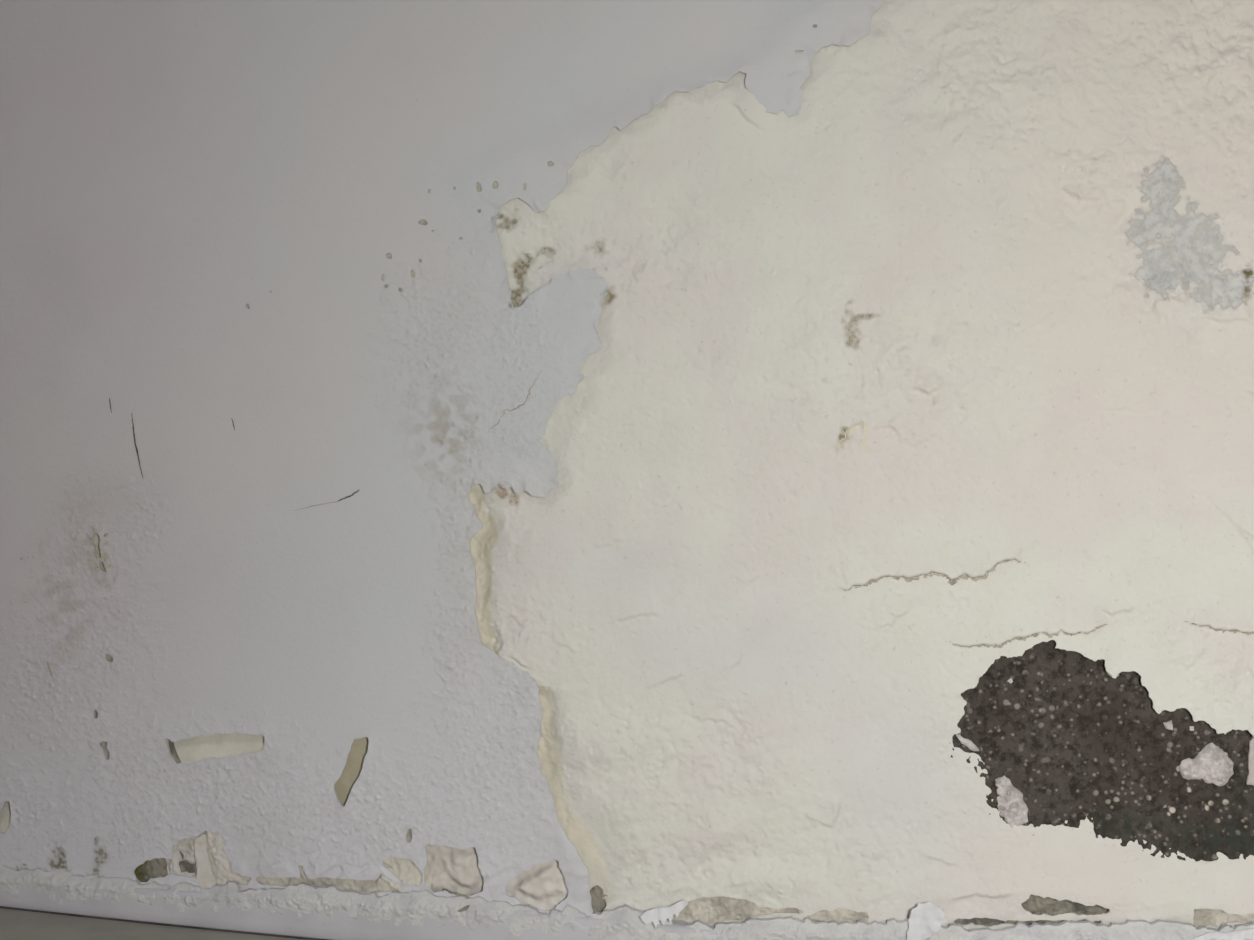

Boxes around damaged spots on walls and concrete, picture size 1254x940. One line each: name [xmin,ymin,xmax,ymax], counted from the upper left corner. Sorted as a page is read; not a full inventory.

peeling [479,0,1254,940]
crack [844,559,1026,591]
crack [1184,621,1254,636]
spalling [166,733,265,764]
spalling [335,737,369,806]
peeling [166,831,250,888]
peeling [379,844,484,912]